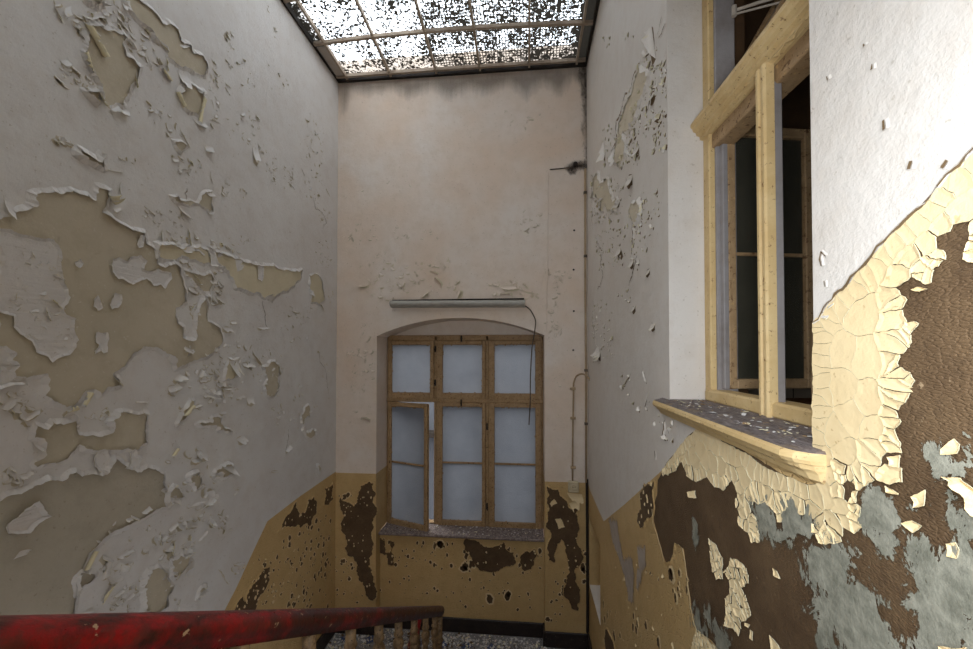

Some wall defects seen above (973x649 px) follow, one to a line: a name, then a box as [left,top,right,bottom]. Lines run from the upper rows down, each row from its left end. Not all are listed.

peeling [53,0,333,227]
peeling [590,47,667,227]
crack [882,118,890,131]
crack [812,146,973,324]
peeling [0,100,334,615]
peeling [620,153,973,649]
peeling [219,481,586,622]
peeling [603,599,675,649]